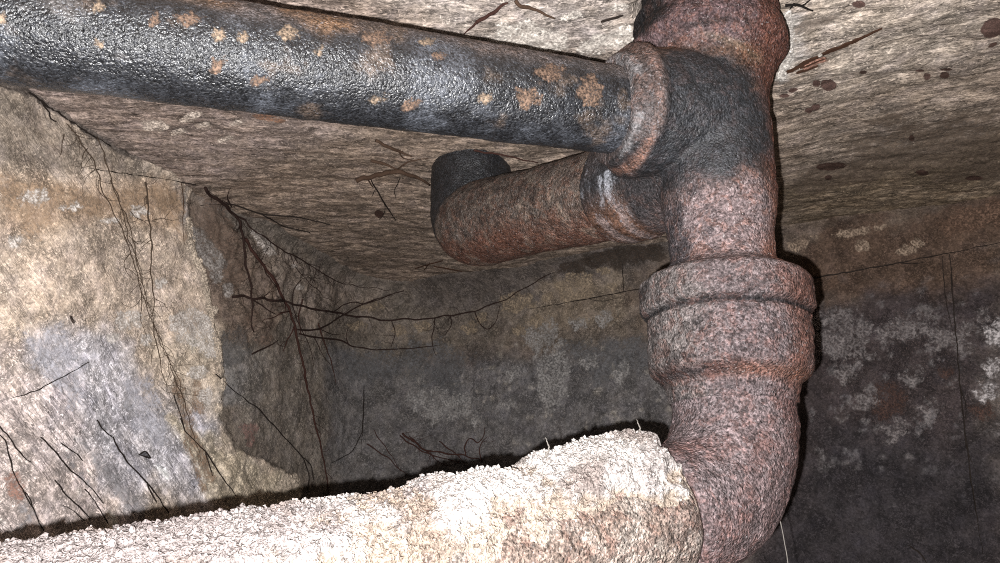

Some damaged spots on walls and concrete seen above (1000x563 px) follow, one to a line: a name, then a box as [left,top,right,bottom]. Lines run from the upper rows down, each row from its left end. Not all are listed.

corrosion [980,18,1000,48]
corrosion [813,79,837,91]
corrosion [916,68,952,80]
crack [28,92,111,146]
corrosion [816,162,846,180]
crack [90,168,330,233]
damp [984,321,1000,344]
crack [11,362,89,399]
damp [973,357,1000,402]
crack [0,426,109,531]
crack [97,420,169,513]
crack [173,395,236,496]